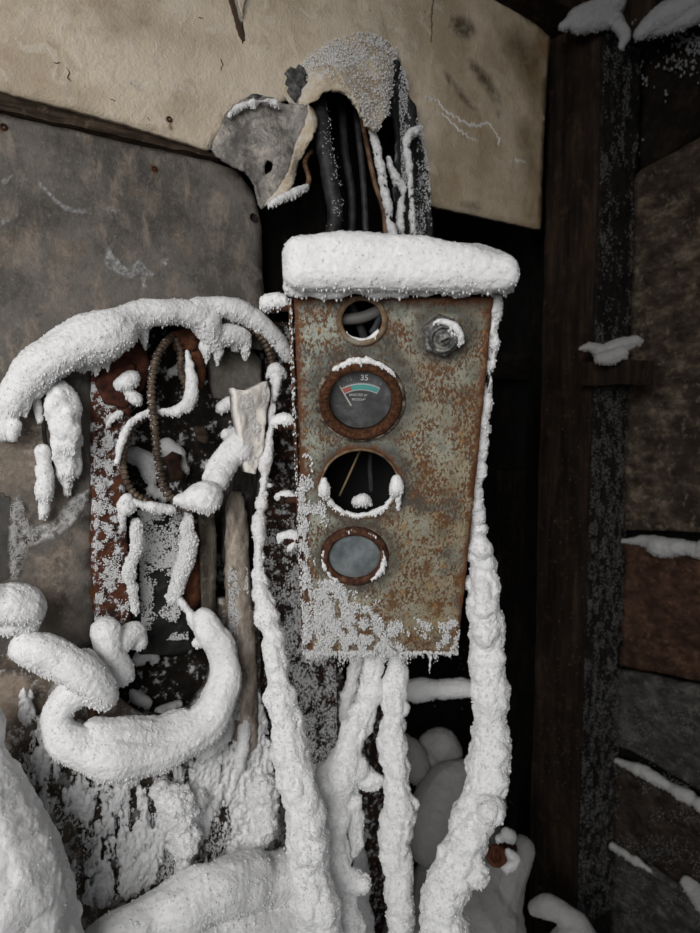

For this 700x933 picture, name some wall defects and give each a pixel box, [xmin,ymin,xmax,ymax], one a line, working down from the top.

peeling [208,94,318,209]
corrosion [170,328,206,388]
corrosion [163,451,187,481]